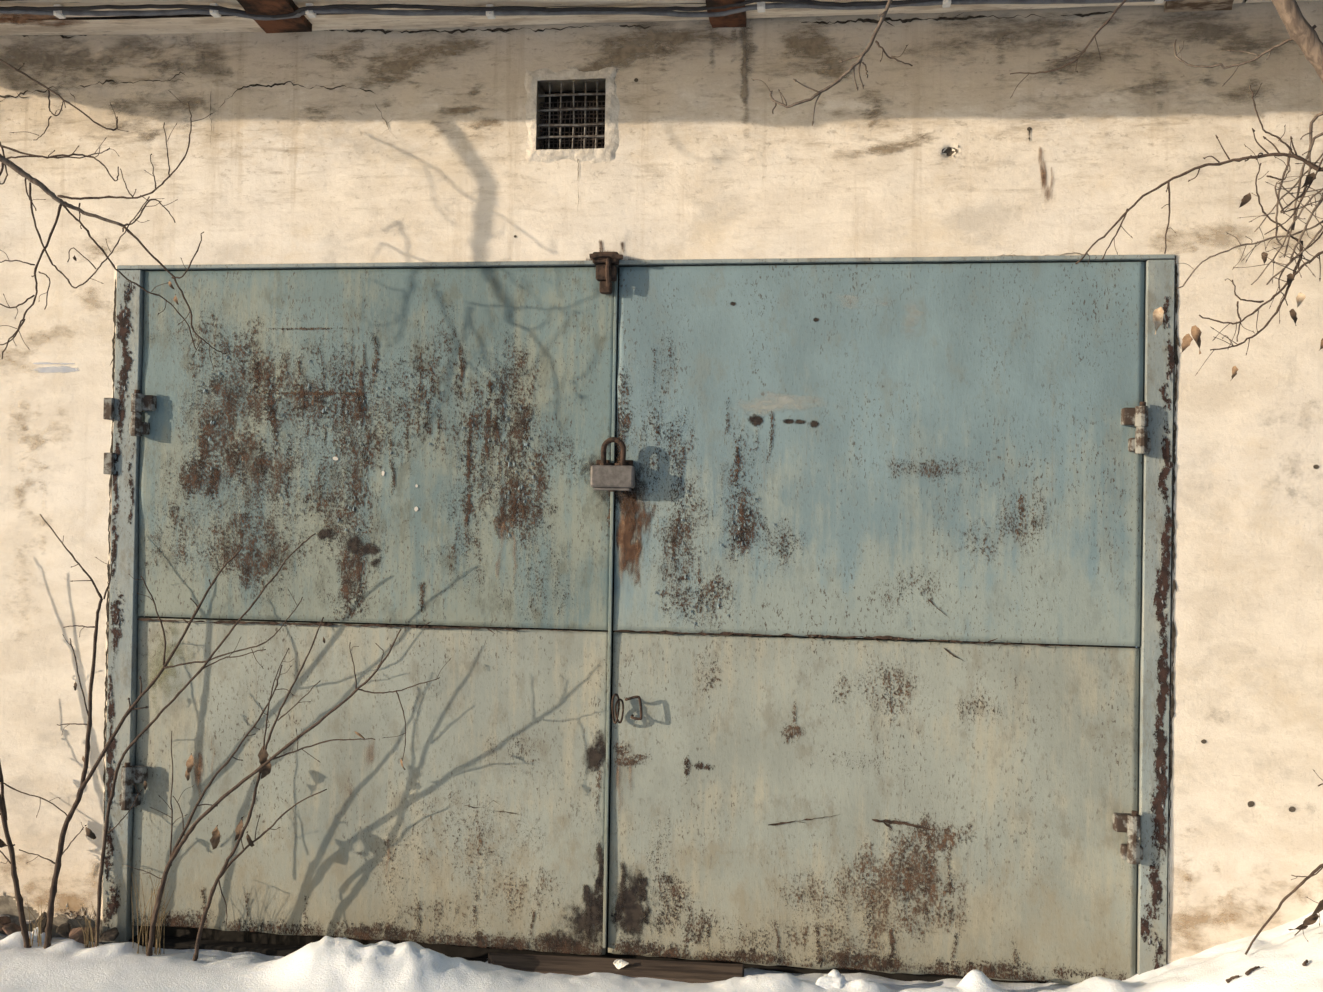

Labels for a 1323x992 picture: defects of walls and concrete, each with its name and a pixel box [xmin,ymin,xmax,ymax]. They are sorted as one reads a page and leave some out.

leakage [0,41,231,90]
leakage [321,40,478,88]
leakage [436,90,497,132]
leakage [569,25,753,119]
leakage [784,25,846,78]
leakage [869,134,929,155]
leakage [1141,13,1295,63]
rust [264,327,382,419]
rust [580,331,681,583]
rust [489,470,533,556]
peeling [0,280,580,944]
rust [131,789,1129,983]